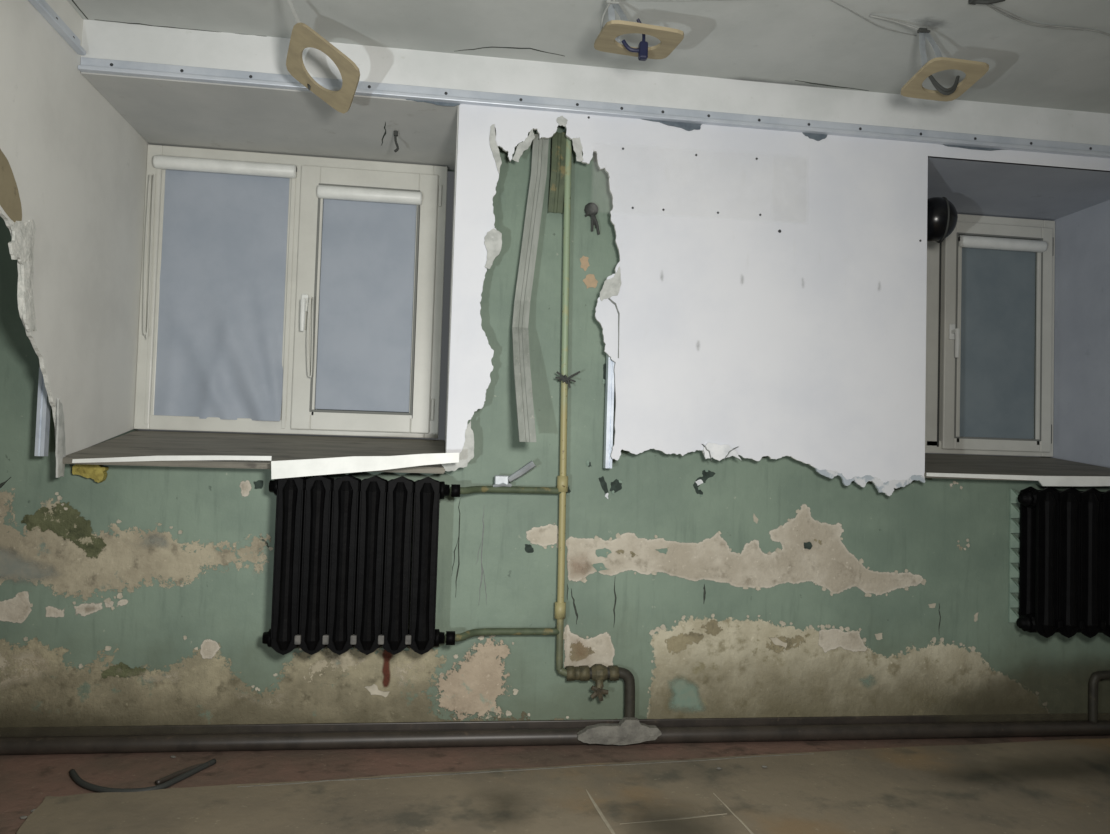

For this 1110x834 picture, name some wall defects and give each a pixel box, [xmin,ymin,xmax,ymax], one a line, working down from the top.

peeling [0,149,22,222]
peeling [580,256,598,288]
peeling [0,488,273,623]
peeling [525,504,926,597]
peeling [0,635,530,727]
rust [382,649,392,687]
peeling [647,614,1020,719]